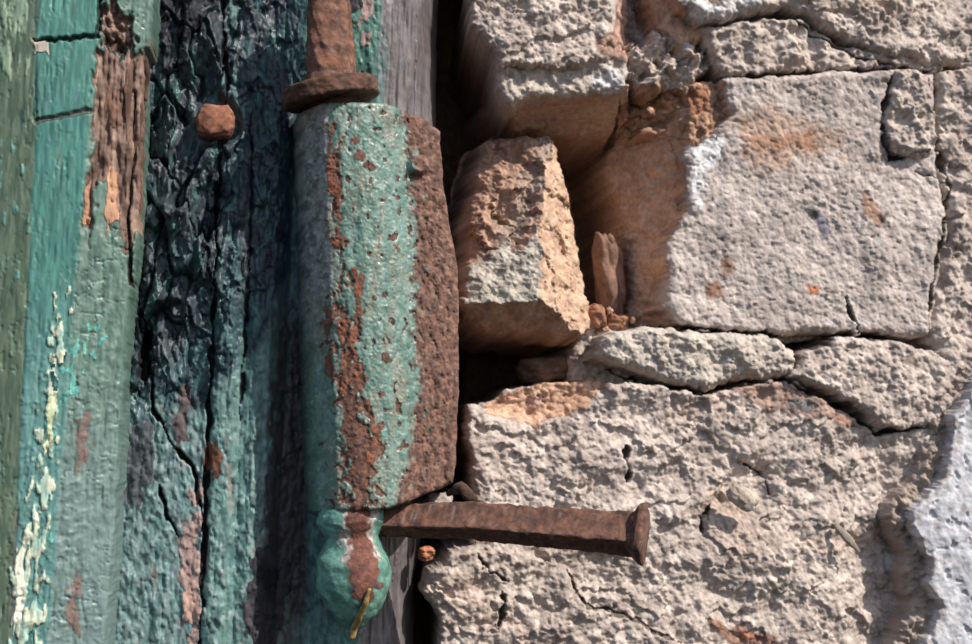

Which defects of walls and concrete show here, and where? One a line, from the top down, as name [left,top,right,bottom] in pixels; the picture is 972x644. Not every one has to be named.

crack [34,107,92,125]
crack [30,34,100,55]
peeling [82,0,146,254]
crack [713,8,951,311]
peeling [8,286,108,644]
corrosion [320,103,417,603]
spalling [465,354,606,428]